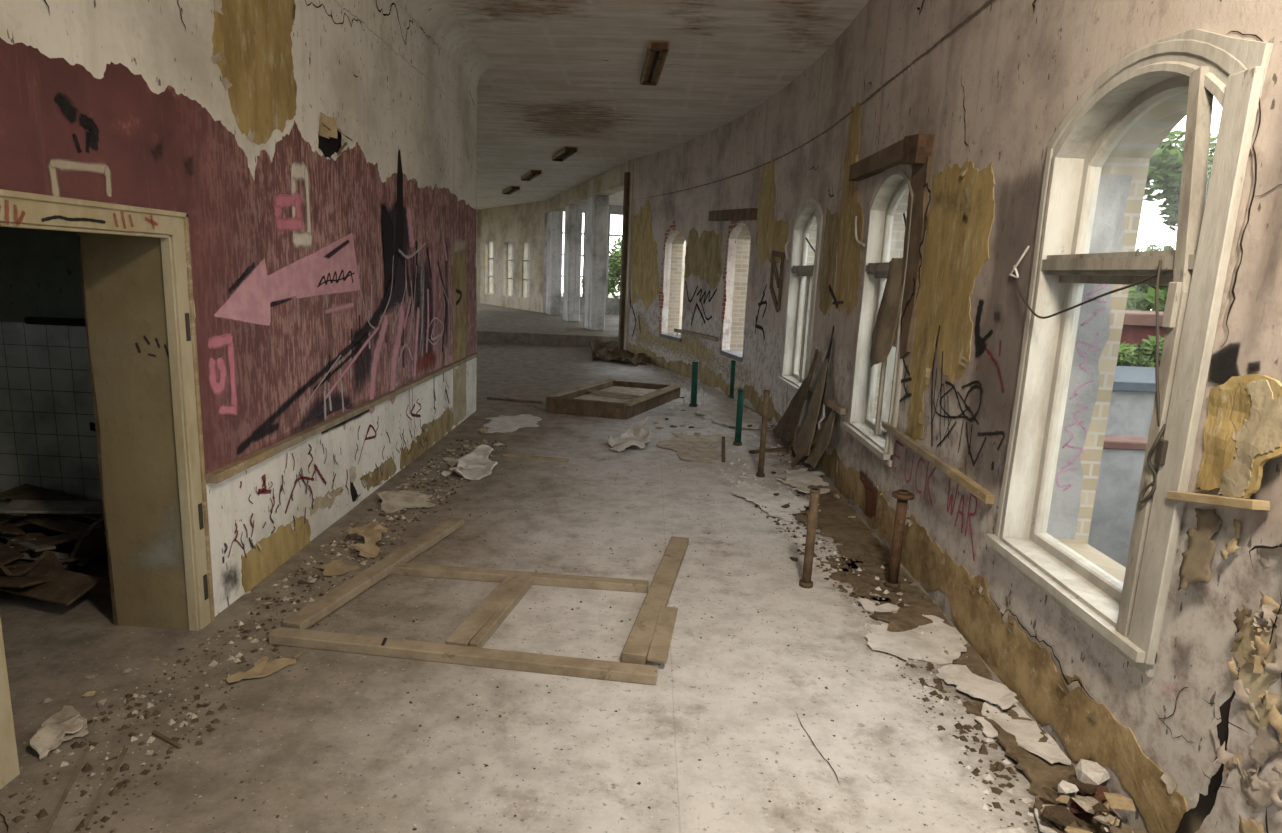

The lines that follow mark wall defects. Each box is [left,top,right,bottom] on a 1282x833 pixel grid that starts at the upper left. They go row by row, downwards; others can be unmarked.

flaking render [212,0,297,145]
crack [305,0,435,45]
crack [1227,31,1275,43]
flaking render [628,200,782,423]
flaking render [756,155,788,265]
flaking render [819,102,863,316]
flaking render [906,161,995,441]
crack [1219,99,1282,347]
flaking render [241,363,467,594]
flaking render [810,443,1188,833]
crack [1155,543,1282,833]
flaking render [1215,591,1282,833]